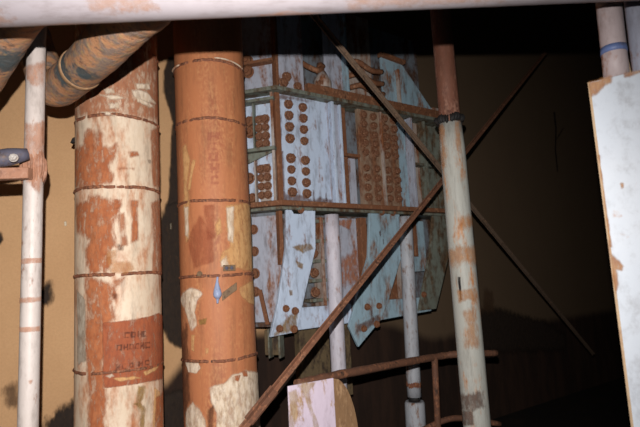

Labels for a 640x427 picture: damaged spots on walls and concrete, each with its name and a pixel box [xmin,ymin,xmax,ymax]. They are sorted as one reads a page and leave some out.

rust [75,34,158,119]
rust [26,121,44,190]
rust [75,129,116,187]
rust [151,129,160,186]
rust [152,201,162,273]
rust [77,196,138,427]
peeling [181,288,206,351]
rust [258,289,270,325]
peeling [186,362,200,373]
rust [155,392,163,427]
peeling [186,403,206,427]
peeling [210,371,259,427]